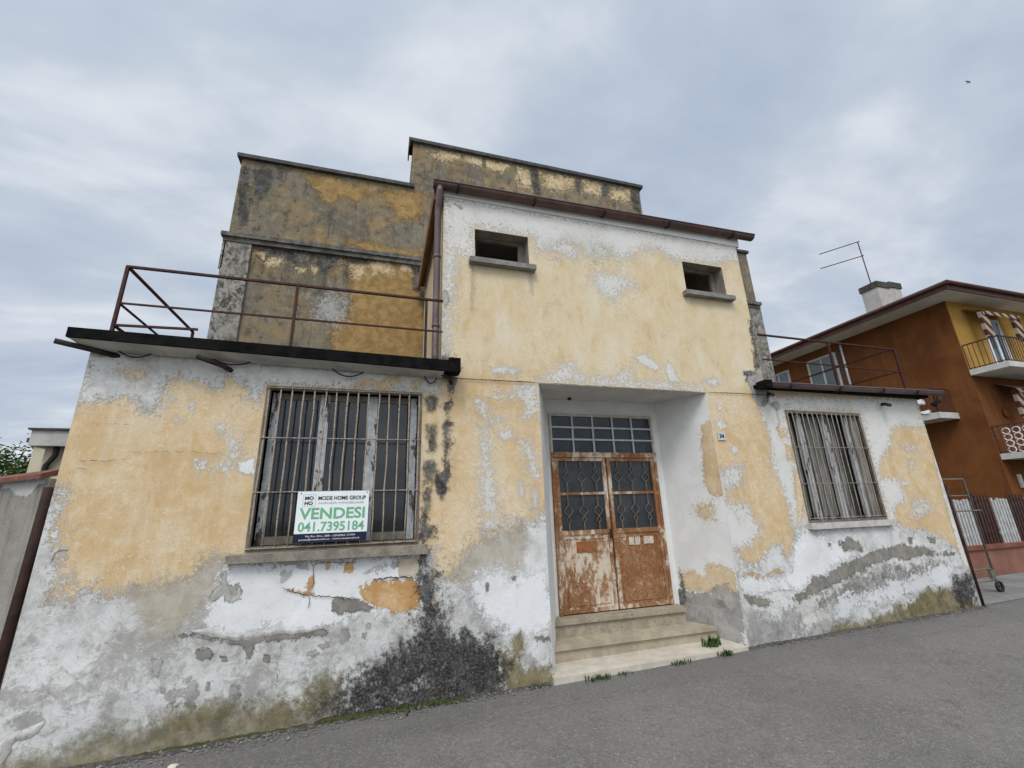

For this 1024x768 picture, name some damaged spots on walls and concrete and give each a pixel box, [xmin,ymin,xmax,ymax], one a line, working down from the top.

peeling [441,196,740,358]
water stain [0,367,554,768]
peeling [0,351,728,768]
peeling [678,366,981,646]
water stain [745,553,979,647]